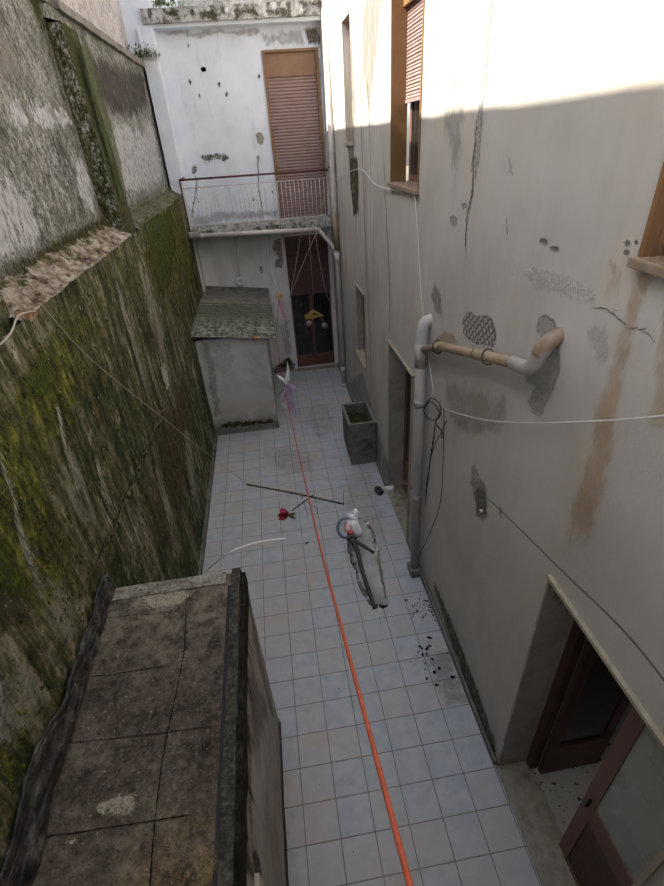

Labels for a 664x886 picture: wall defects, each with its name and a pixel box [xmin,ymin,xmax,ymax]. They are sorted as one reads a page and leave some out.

water stain [305,28,320,44]
crack [465,0,493,251]
water stain [0,172,40,258]
water stain [117,285,147,385]
water stain [138,260,175,407]
crack [594,307,654,343]
water stain [0,460,36,576]
water stain [56,406,78,491]
water stain [96,457,112,512]
water stain [155,466,177,539]
flaking render [471,468,487,516]
water stain [137,590,190,609]